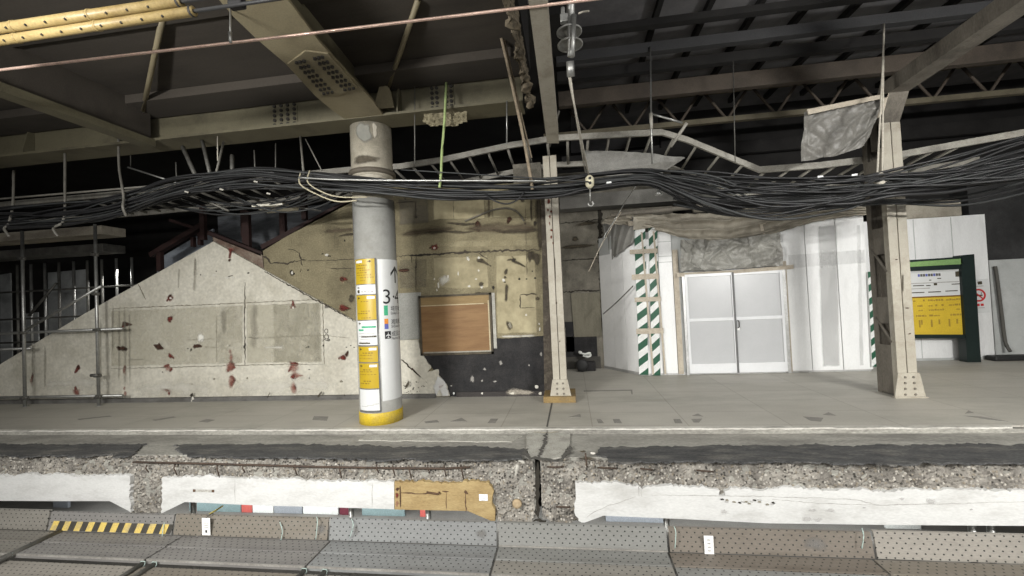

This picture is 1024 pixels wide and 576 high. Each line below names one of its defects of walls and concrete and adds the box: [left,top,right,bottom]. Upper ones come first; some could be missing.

spalling [502,0,536,109]
crack [111,249,353,369]
spalling [400,339,455,396]
spalling [507,385,542,395]
spalling [0,450,1024,523]
crack [521,431,573,522]